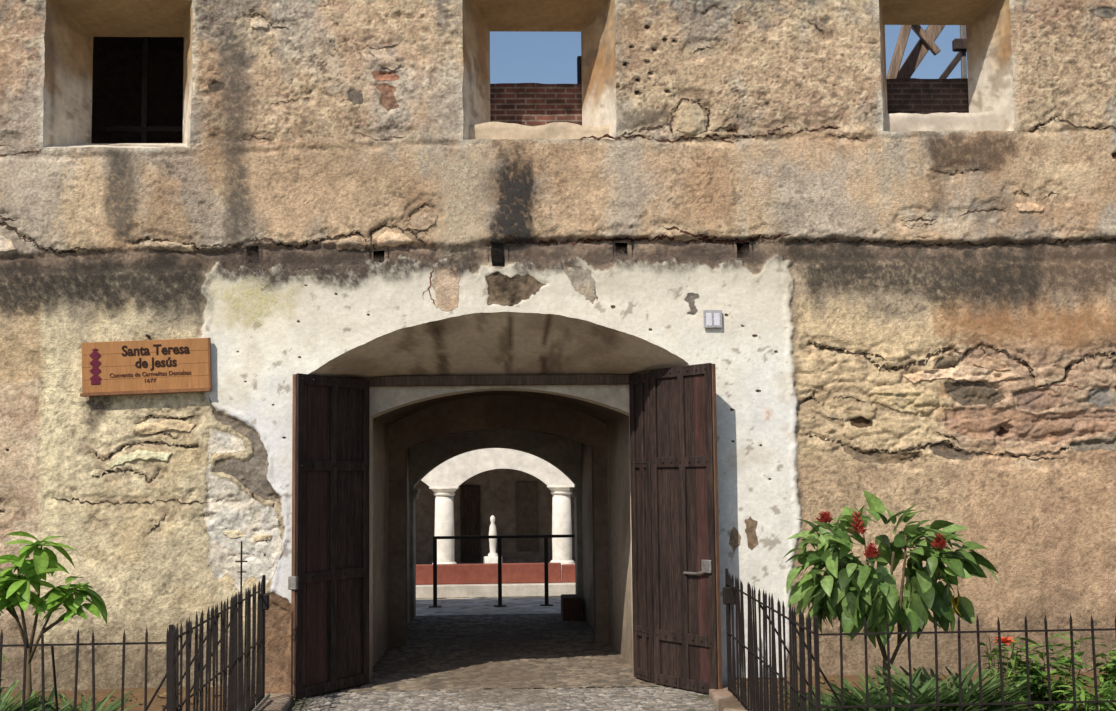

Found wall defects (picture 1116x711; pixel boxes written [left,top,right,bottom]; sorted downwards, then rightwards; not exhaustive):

crack [580,98,869,143]
crack [1031,116,1116,132]
damp [0,49,1116,322]
crack [0,215,87,254]
spalling [432,265,461,311]
spalling [485,271,546,306]
spalling [563,264,597,303]
spalling [935,355,958,369]
crack [809,341,1116,390]
crack [800,392,1115,462]
spalling [842,381,1116,464]
spalling [203,398,295,699]